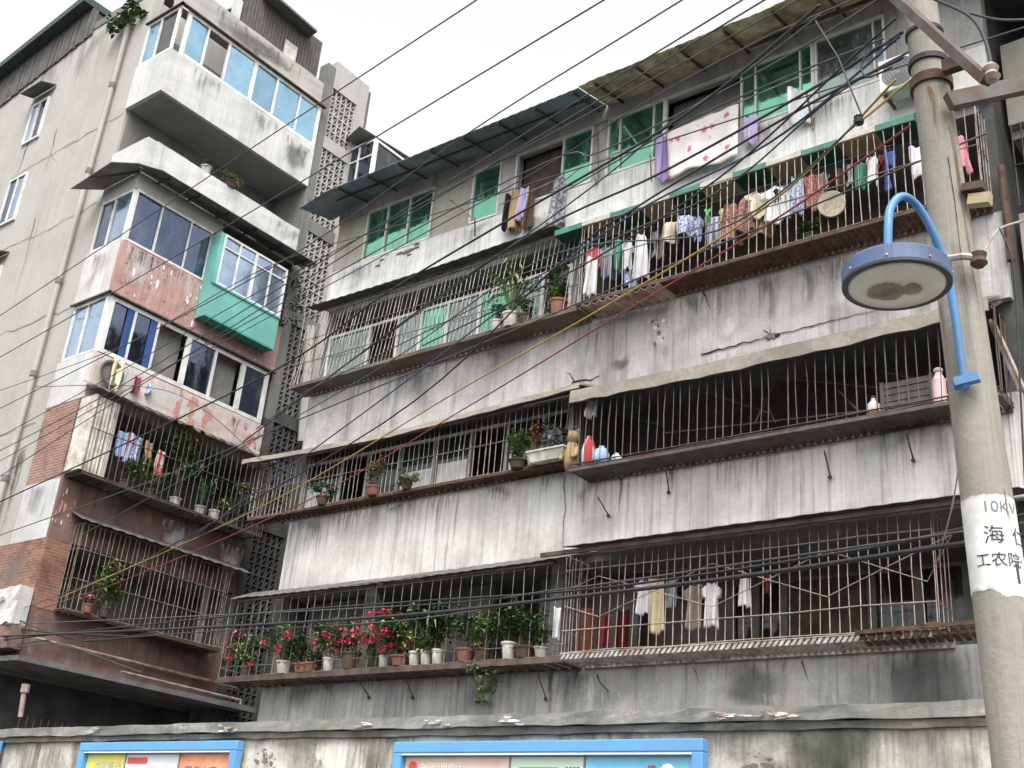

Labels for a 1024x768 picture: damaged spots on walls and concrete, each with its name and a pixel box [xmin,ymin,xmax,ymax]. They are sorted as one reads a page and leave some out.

crack [15,112,124,176]
leakage [290,148,301,164]
crack [4,202,97,302]
peeling [121,251,201,327]
leakage [832,281,845,304]
peeling [173,389,212,437]
leakage [895,659,958,703]
spalling [708,710,800,720]